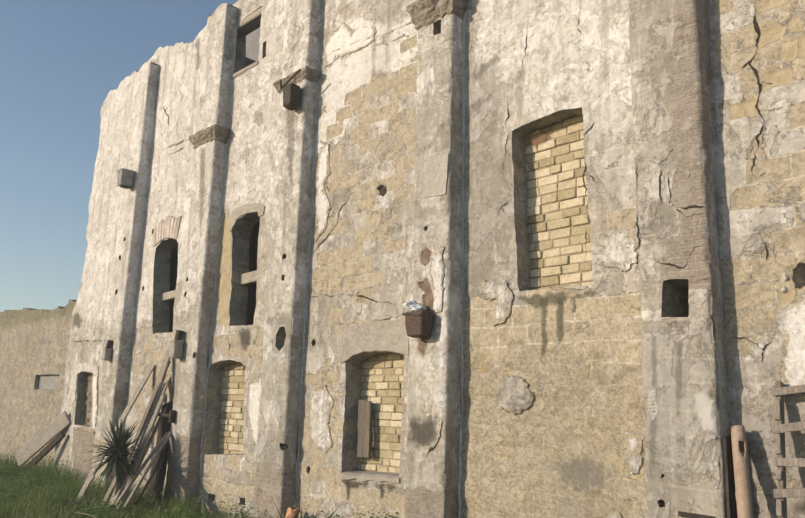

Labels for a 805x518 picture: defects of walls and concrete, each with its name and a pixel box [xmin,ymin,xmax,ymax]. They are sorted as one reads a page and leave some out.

spalling [758,17,805,91]
crack [742,9,773,178]
flaking render [314,144,353,241]
crack [635,162,711,282]
crack [658,150,704,217]
flaking render [417,246,445,313]
crack [734,337,771,362]
flaking render [776,262,805,400]
flaking render [309,384,334,453]
damp [408,420,434,445]